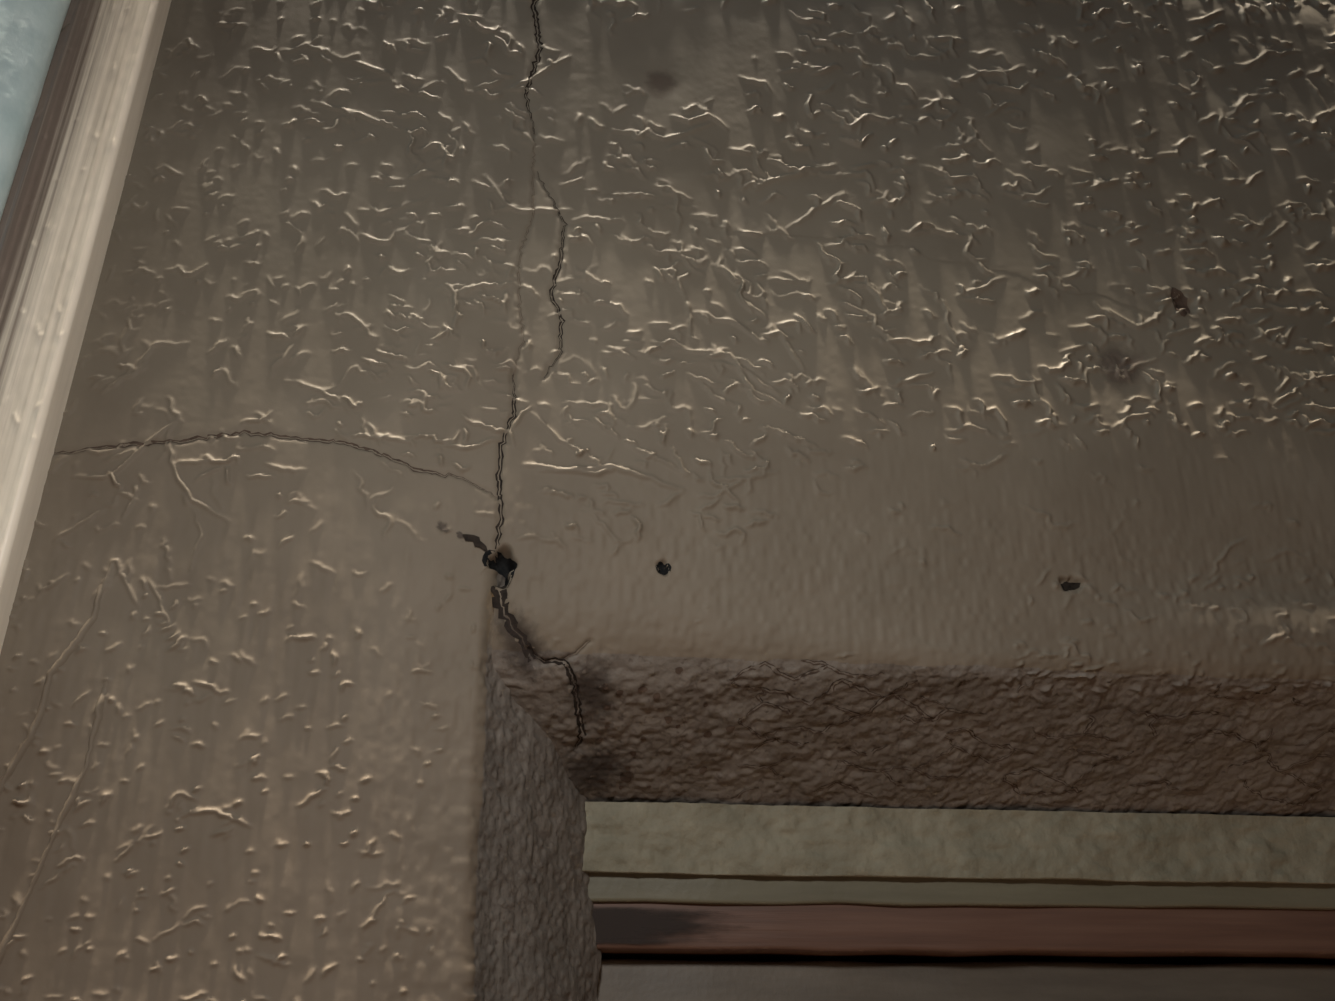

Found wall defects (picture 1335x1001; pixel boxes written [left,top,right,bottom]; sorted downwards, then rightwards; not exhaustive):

crack [54,0,591,752]
crack [729,659,1335,807]